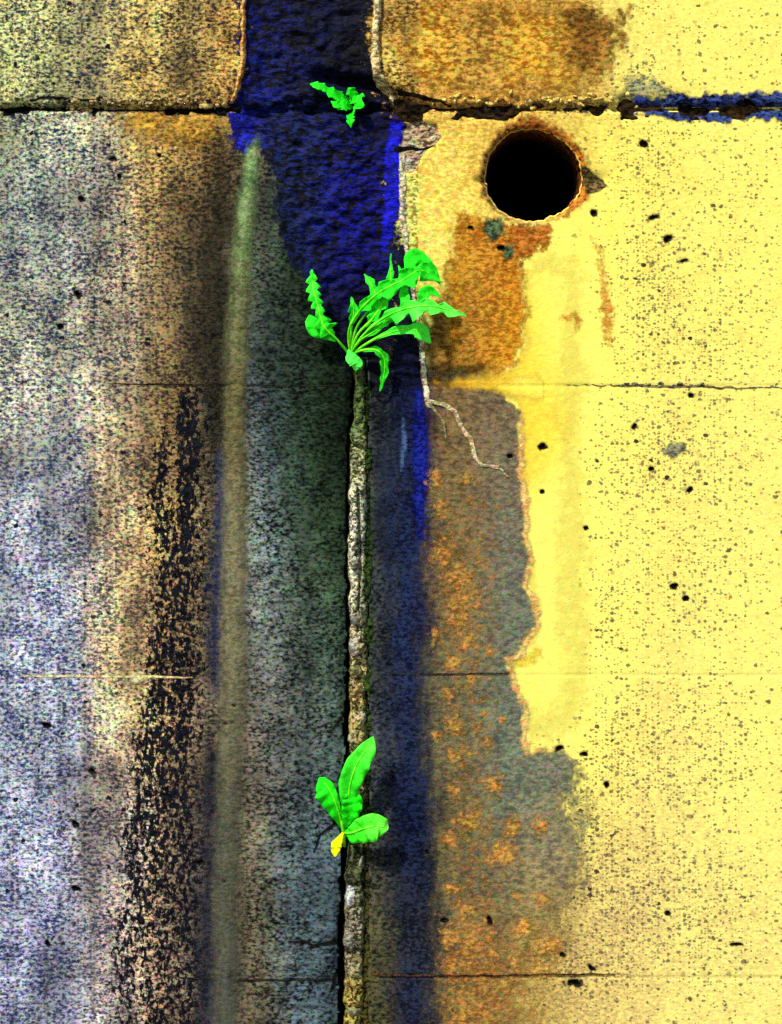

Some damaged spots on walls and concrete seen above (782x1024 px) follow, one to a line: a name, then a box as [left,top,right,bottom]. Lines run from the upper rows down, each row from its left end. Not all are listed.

rust [394,0,633,95]
rust [424,116,589,383]
rust [596,245,614,345]
damp [22,168,231,1024]
crack [109,360,368,767]
peeling [425,470,455,520]
crack [426,399,509,477]
peeling [431,497,566,1024]
crack [178,804,368,1024]